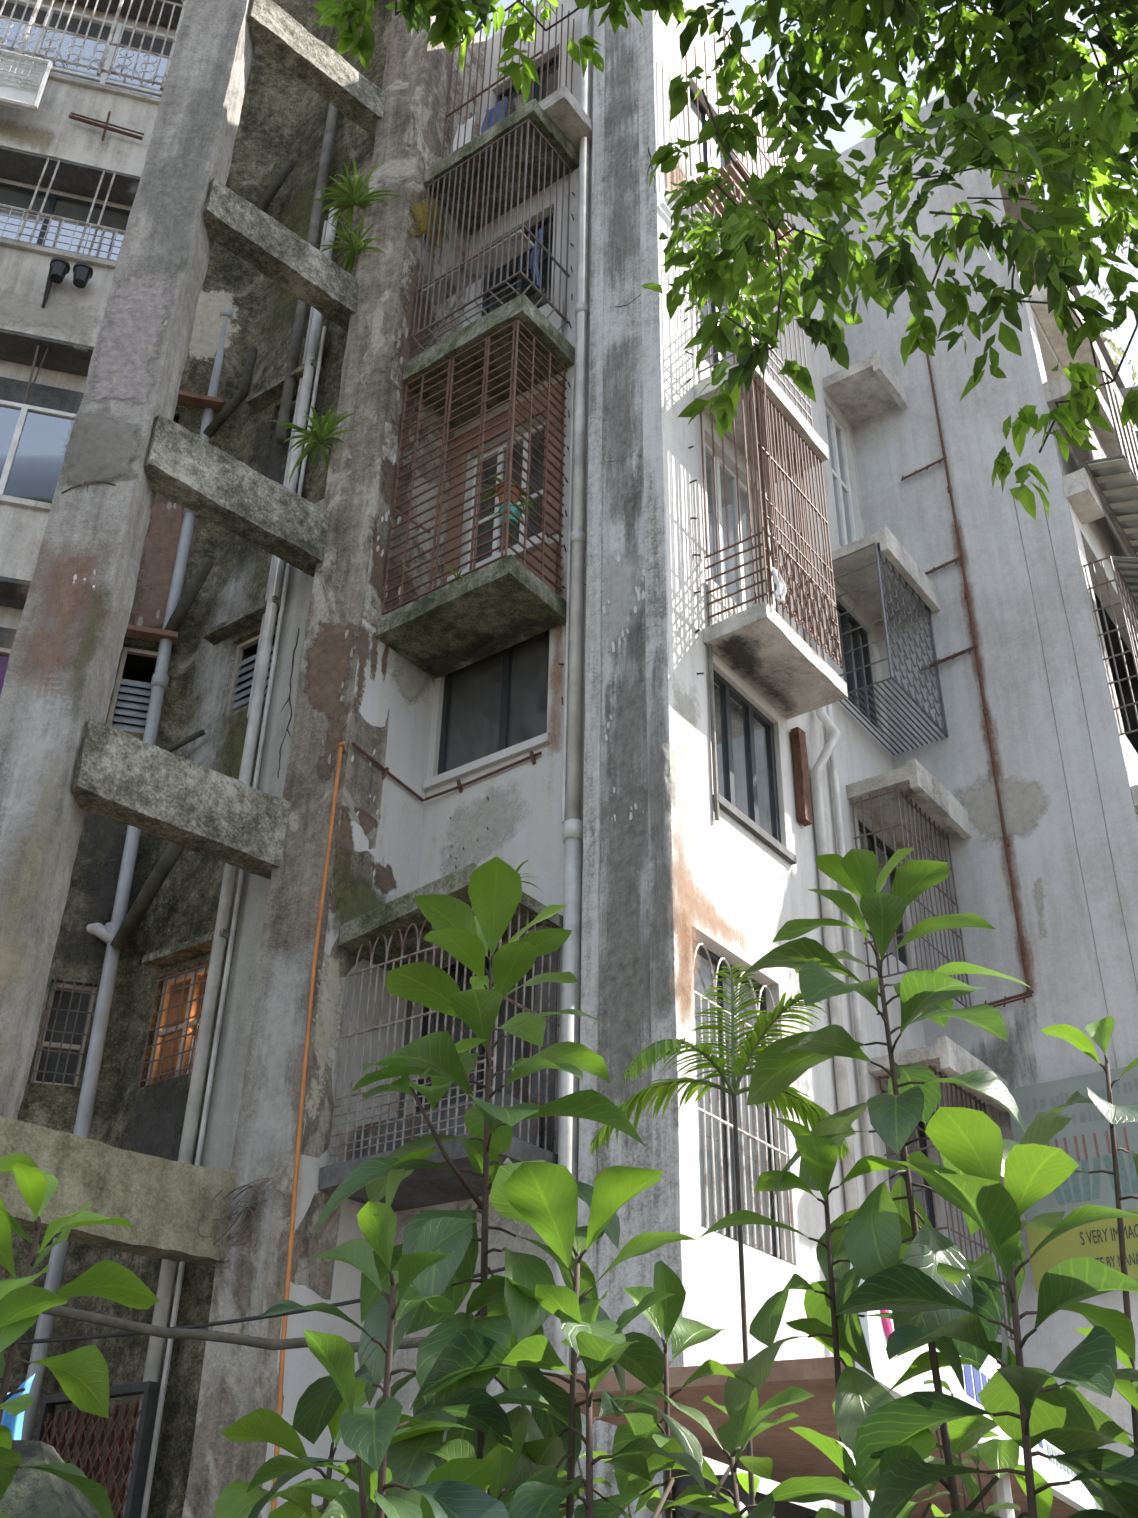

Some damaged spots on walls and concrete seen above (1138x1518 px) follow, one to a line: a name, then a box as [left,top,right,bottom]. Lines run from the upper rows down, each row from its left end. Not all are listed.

leakage [280,147,347,264]
leakage [604,31,640,281]
leakage [245,402,302,485]
leakage [188,540,256,767]
flaking render [305,620,389,785]
leakage [599,340,699,1103]
rust [953,525,983,682]
leakage [57,810,147,964]
flaking render [329,794,397,913]
rust [672,841,744,1023]
rust [1004,835,1034,991]